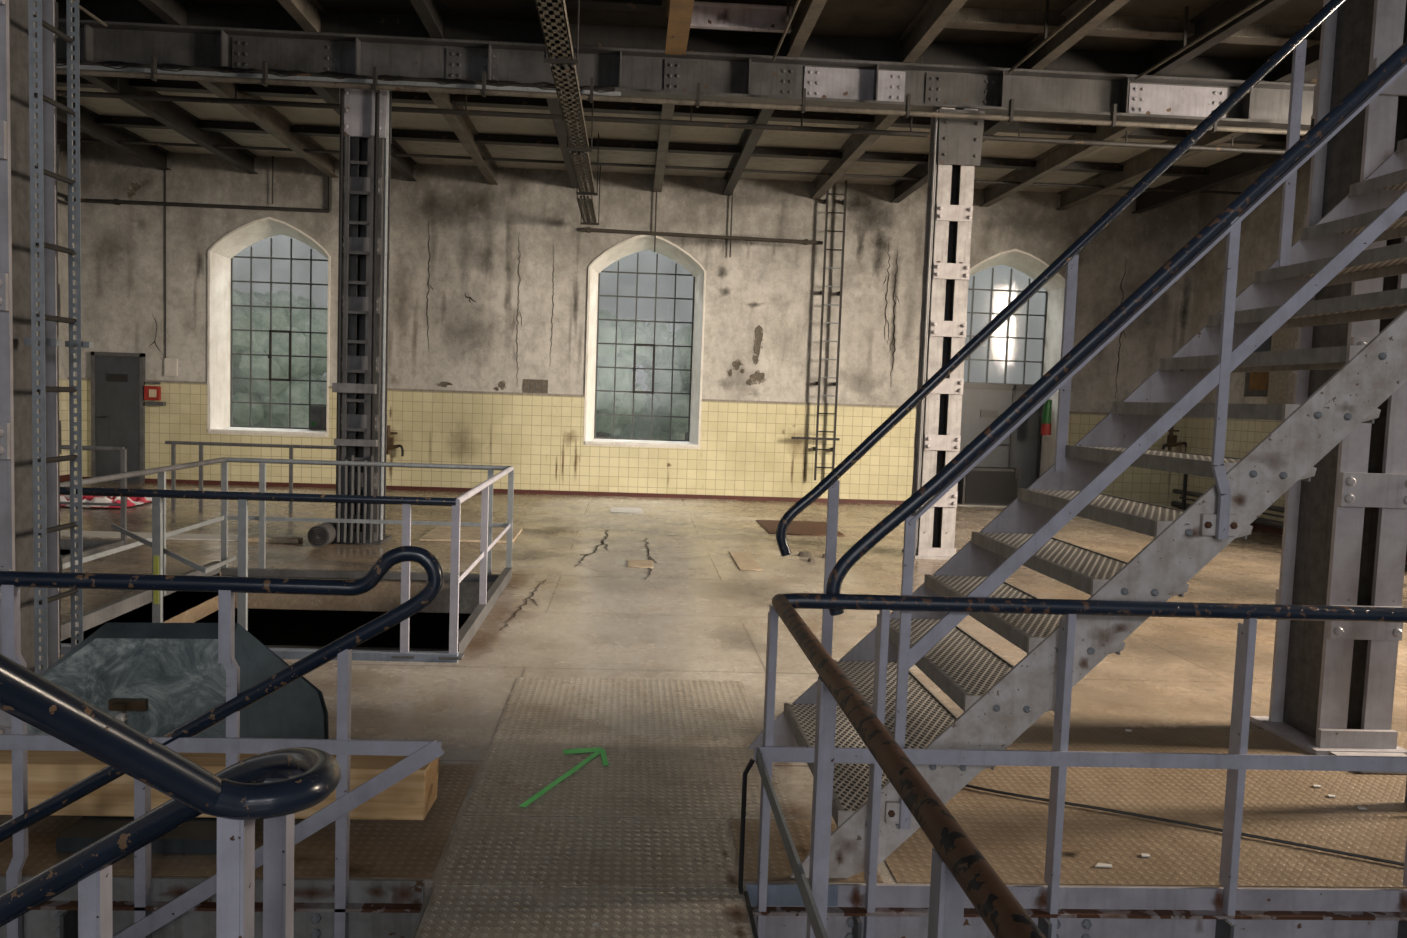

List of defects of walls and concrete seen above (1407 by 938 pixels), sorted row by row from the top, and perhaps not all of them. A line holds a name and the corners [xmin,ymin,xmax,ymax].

crack [501,530,608,630]
crack [644,538,657,579]